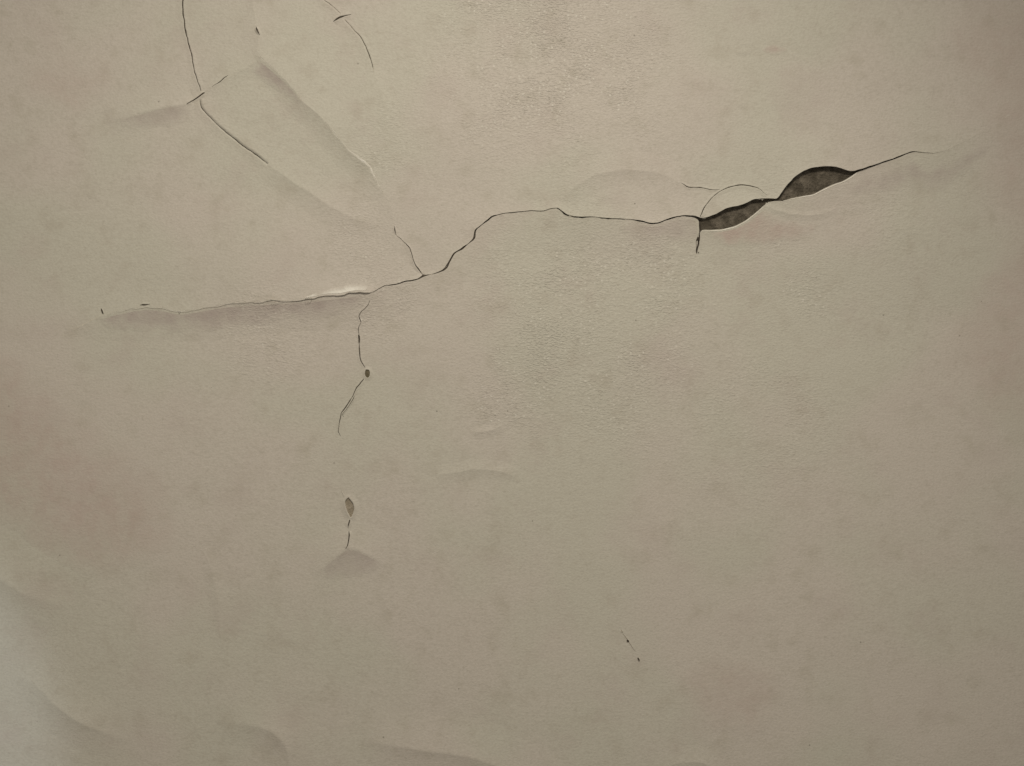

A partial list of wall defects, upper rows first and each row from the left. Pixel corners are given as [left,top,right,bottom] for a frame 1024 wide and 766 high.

crack [177,0,441,275]
peeling [71,88,1010,342]
crack [699,182,767,219]
crack [335,300,374,436]